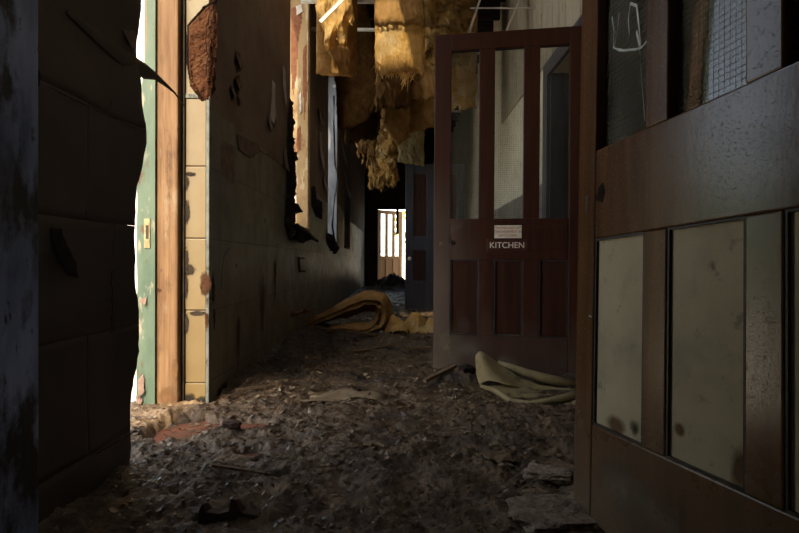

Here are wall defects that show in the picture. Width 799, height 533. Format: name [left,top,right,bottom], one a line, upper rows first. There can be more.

peeling [67,10,185,107]
flaking render [186,0,218,101]
flaking render [285,4,339,254]
peeling [135,374,145,405]